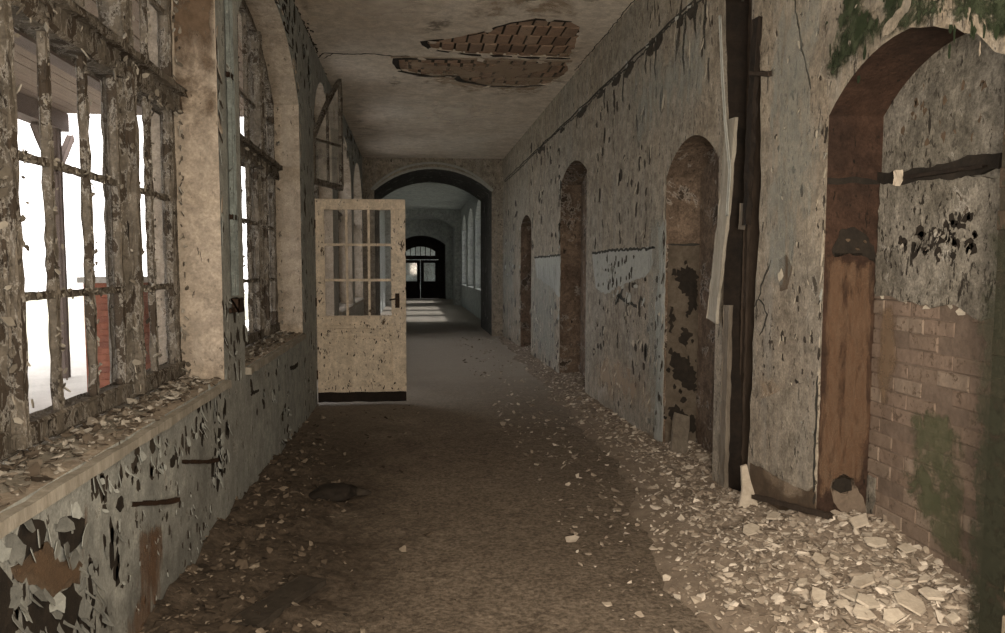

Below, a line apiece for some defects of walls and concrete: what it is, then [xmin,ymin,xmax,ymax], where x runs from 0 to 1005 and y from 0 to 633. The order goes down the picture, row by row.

spalling [392,17,587,88]
spalling [909,0,1005,54]
peeling [113,0,188,248]
peeling [19,149,111,273]
peeling [25,211,169,324]
spalling [592,90,700,443]